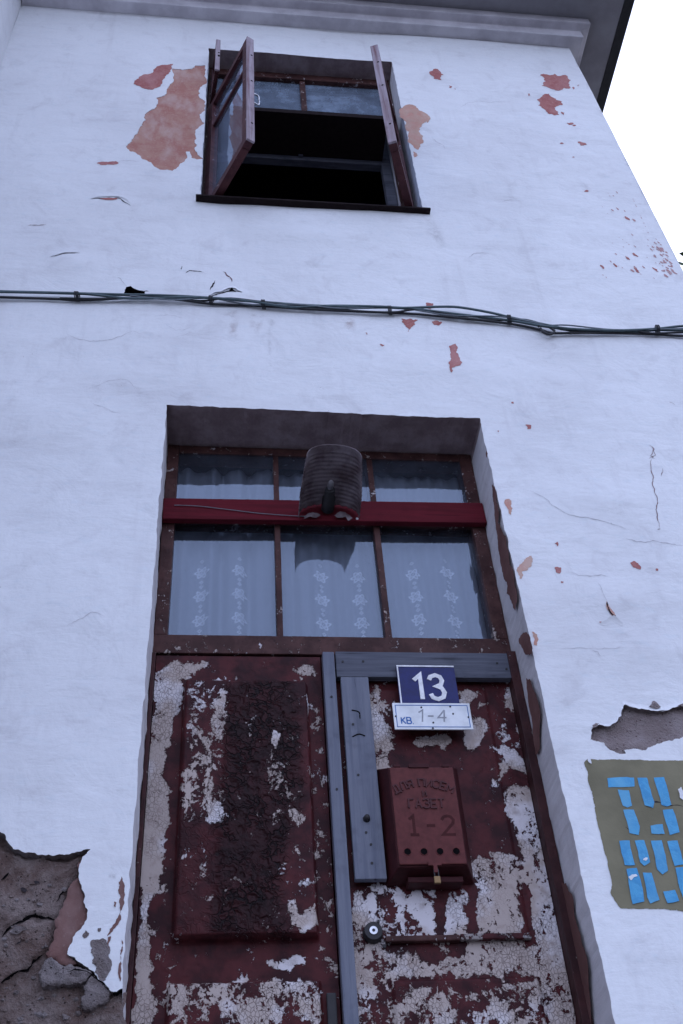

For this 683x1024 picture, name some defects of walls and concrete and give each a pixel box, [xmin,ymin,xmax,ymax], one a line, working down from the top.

peeling [126,64,207,171]
peeling [399,104,430,157]
peeling [528,74,576,126]
peeling [600,206,677,279]
peeling [448,344,462,372]
crack [532,446,676,545]
peeling [492,485,533,610]
peeling [519,632,538,655]
flaking render [591,700,683,754]
flaking render [0,832,127,1024]